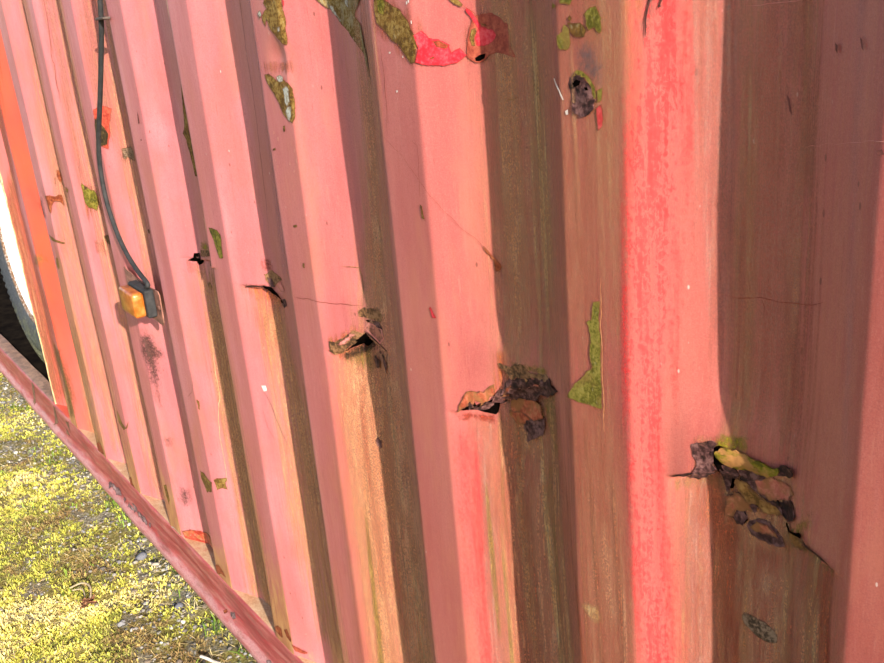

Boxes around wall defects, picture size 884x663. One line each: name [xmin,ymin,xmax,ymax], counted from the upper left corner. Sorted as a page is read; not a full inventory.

peeling [258,0,288,45]
peeling [317,0,371,90]
peeling [374,0,417,63]
peeling [552,0,602,50]
peeling [265,63,297,173]
rust [22,0,169,503]
peeling [456,279,605,442]
rust [342,353,432,663]
rust [486,398,585,663]
rust [742,612,778,643]